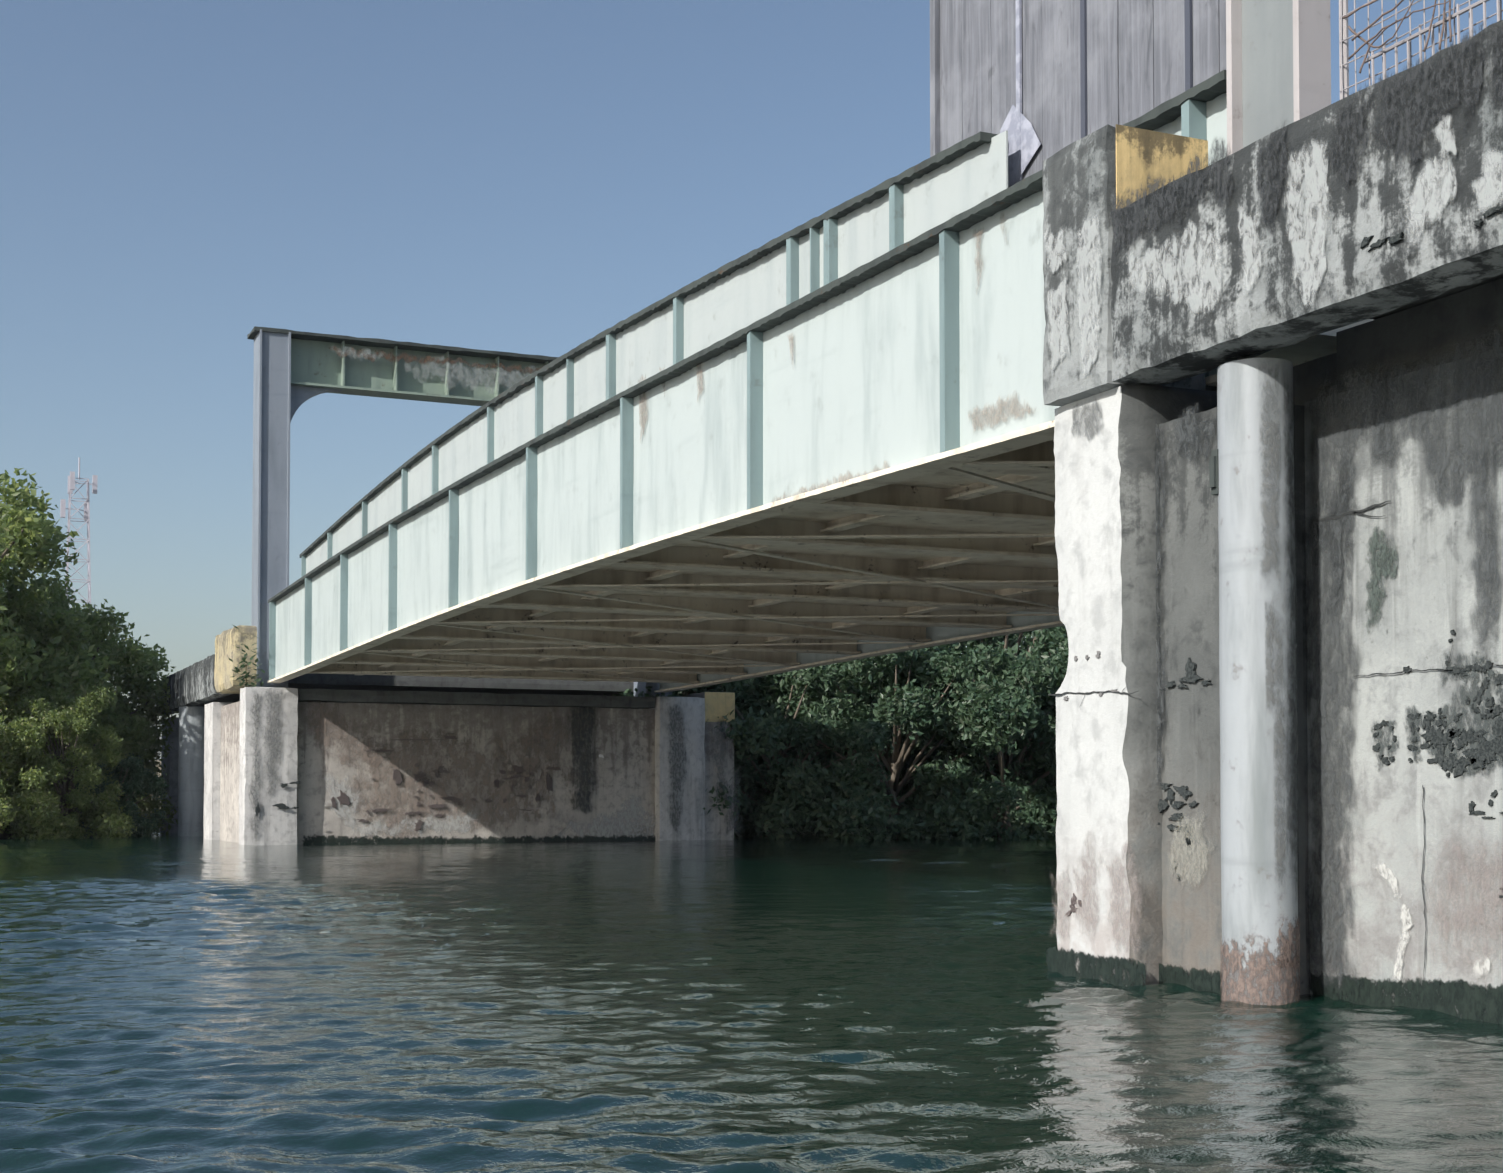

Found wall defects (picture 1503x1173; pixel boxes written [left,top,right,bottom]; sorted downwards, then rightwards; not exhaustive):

leakage [1044,25,1503,374]
leakage [249,691,283,838]
leakage [557,706,686,841]
crack [1048,686,1138,708]
spalling [1158,783,1199,846]
leakage [1302,329,1503,986]
crack [1353,643,1503,677]
peeling [1372,661,1503,778]
peeling [1469,790,1503,819]
rust [1220,918,1300,1006]